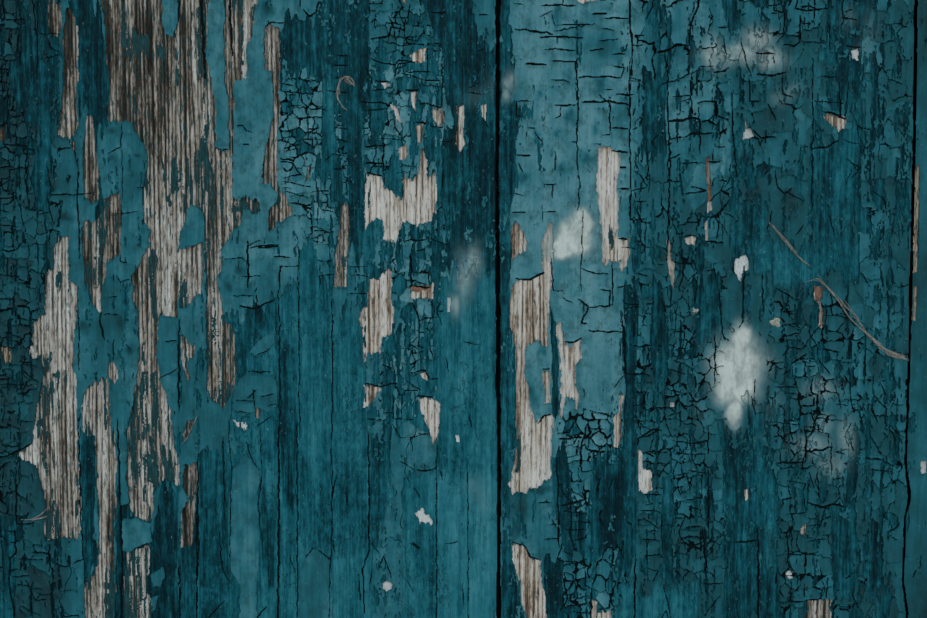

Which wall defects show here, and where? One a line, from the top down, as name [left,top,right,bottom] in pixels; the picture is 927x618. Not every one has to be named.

crack [0,0,91,618]
peeling [17,0,582,618]
crack [178,0,470,618]
peeling [588,145,653,582]
peeling [650,239,675,386]
peeling [721,428,782,618]
peeling [804,598,832,618]